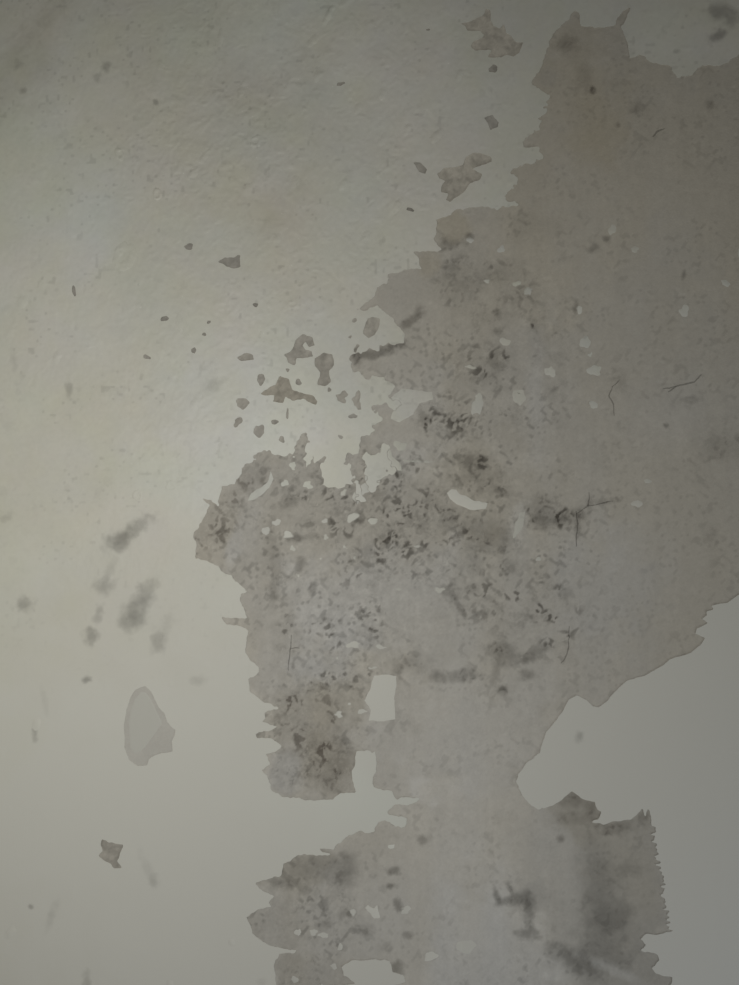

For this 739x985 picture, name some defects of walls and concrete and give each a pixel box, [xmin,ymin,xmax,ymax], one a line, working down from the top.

peeling [193,8,739,985]
peeling [124,686,175,766]
peeling [99,840,123,868]